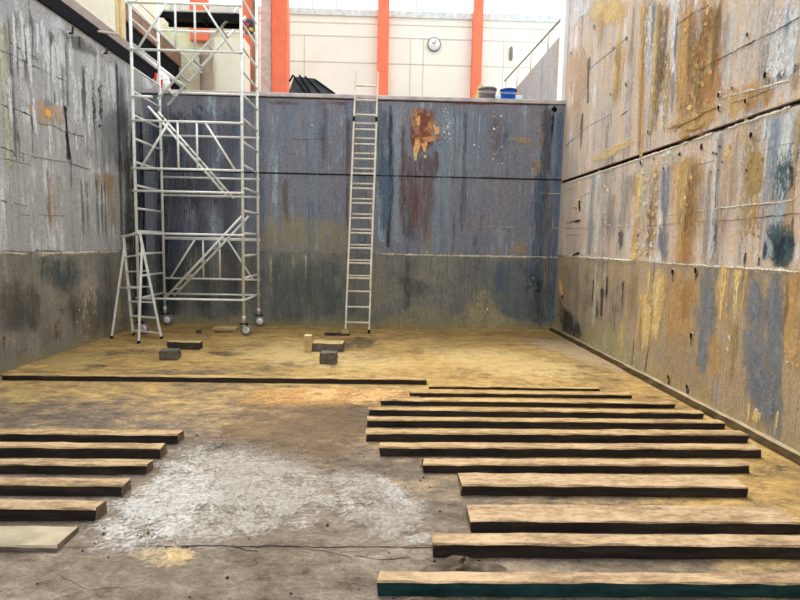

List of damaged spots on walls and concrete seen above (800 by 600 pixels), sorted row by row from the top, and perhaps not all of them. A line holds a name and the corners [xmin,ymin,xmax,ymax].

rust [30,99,63,125]
leakage [4,11,90,160]
leakage [2,62,170,329]
rust [400,131,419,232]
leakage [374,104,800,439]
rust [630,268,667,352]
rust [672,144,703,263]
rust [590,0,789,239]